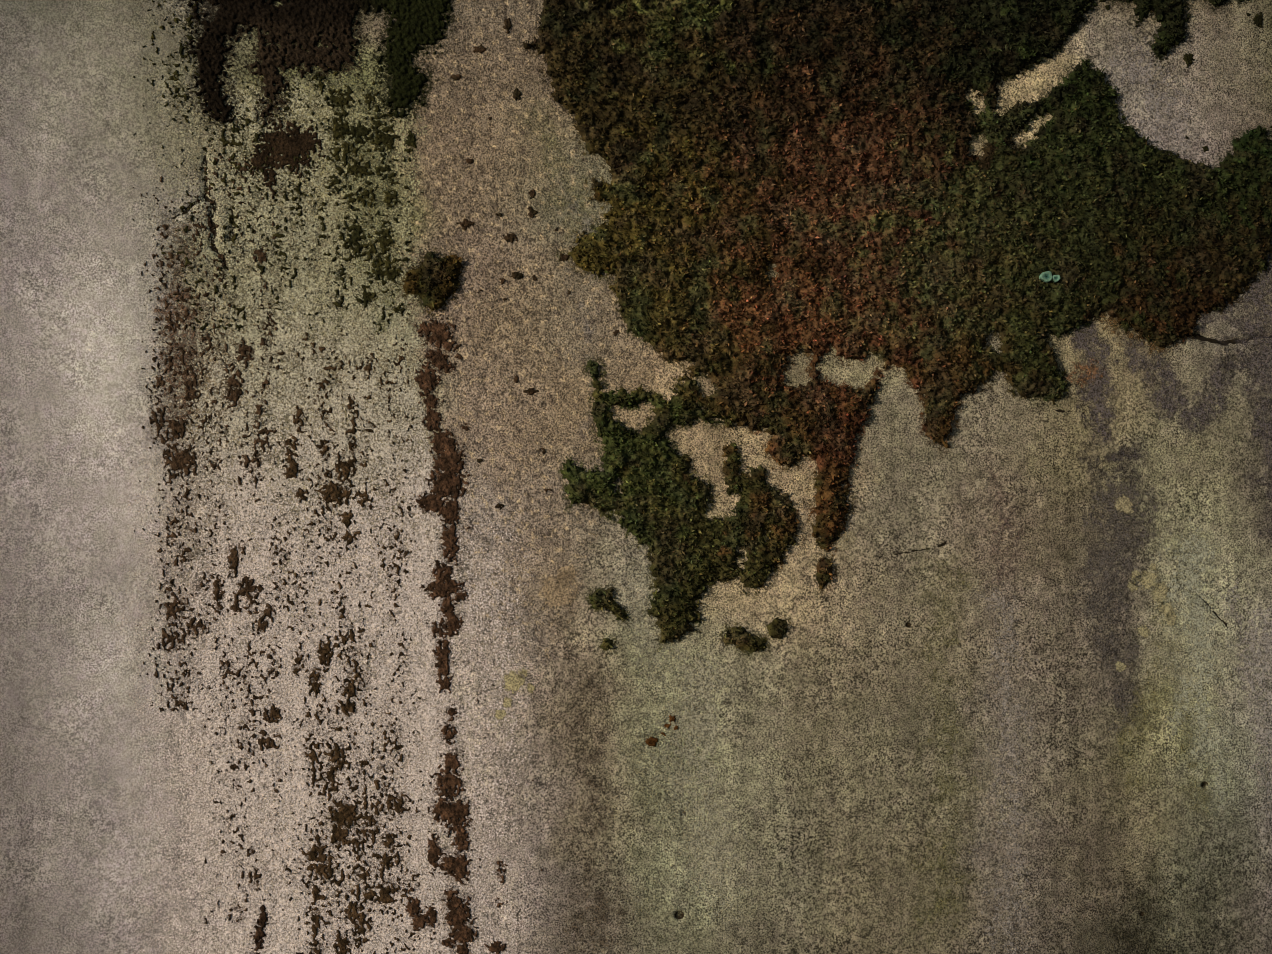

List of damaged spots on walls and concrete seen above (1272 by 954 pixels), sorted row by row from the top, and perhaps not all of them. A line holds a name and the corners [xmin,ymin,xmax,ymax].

water stain [121,76,544,954]
water stain [1066,231,1272,840]
crack [1186,334,1272,346]